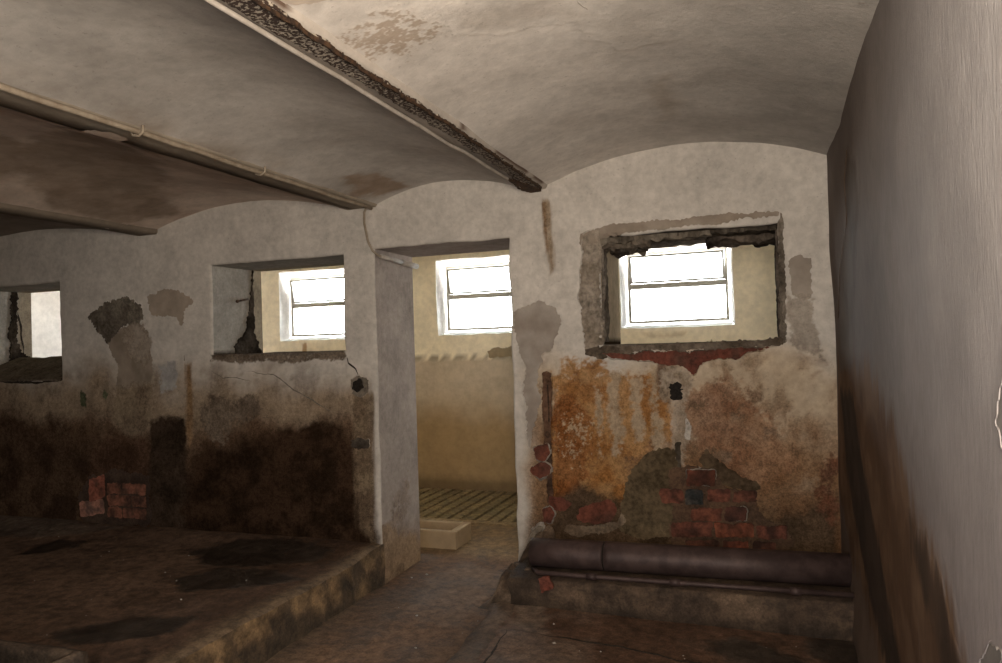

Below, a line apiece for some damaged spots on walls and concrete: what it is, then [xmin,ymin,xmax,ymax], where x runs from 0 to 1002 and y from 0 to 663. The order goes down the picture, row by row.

water stain [0,125,186,229]
flaking render [88,296,154,386]
flaking render [577,211,787,408]
corrosion [542,352,671,495]
corrosion [686,367,804,493]
flaking render [78,468,152,527]
water stain [0,381,420,595]
flaking render [659,464,795,550]
corrosion [811,450,841,530]